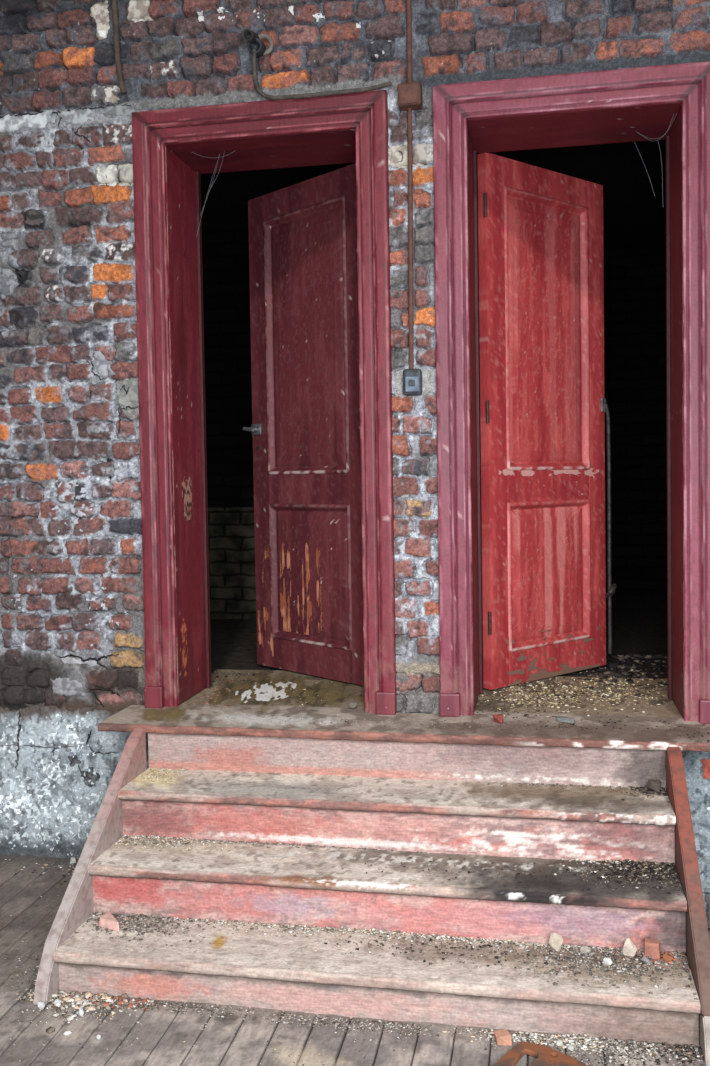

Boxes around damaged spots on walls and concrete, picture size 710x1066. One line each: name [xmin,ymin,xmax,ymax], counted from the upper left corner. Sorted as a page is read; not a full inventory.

peeling [258,543,322,656]
crack [55,654,120,707]
peeling [507,626,600,686]
crack [0,711,115,778]